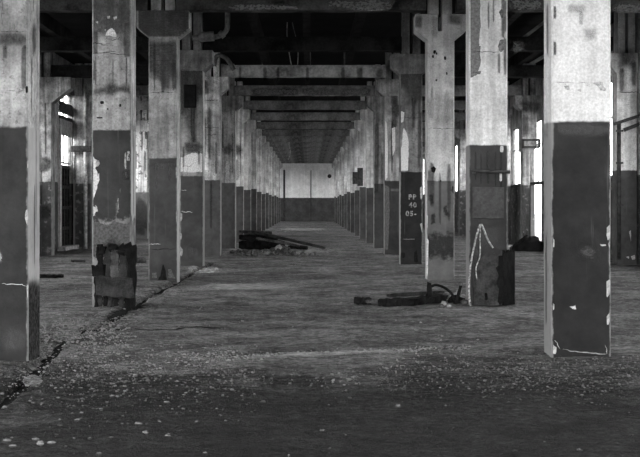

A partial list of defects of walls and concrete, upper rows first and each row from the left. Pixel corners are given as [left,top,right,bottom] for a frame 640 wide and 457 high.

peeling [470,0,481,78]
peeling [93,202,130,258]
crack [0,265,228,409]